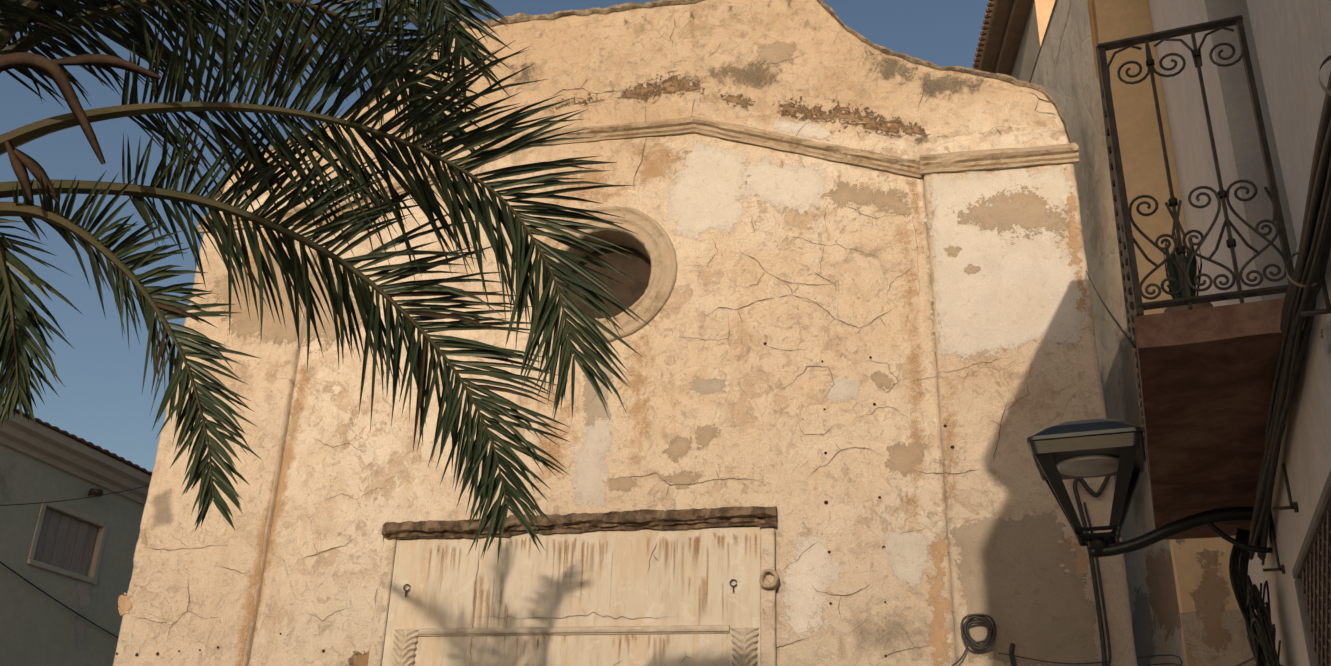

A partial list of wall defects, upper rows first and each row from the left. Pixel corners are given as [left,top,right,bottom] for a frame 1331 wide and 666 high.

crack [554,78,647,194]
spalling [549,70,756,113]
spalling [772,95,928,141]
peeling [660,136,1090,364]
peeling [581,349,614,429]
crack [611,470,767,496]
crack [683,206,1010,478]
crack [922,388,1030,478]
crack [470,546,668,661]
peeling [780,530,842,642]
crack [782,543,872,614]
peeling [881,510,1099,666]